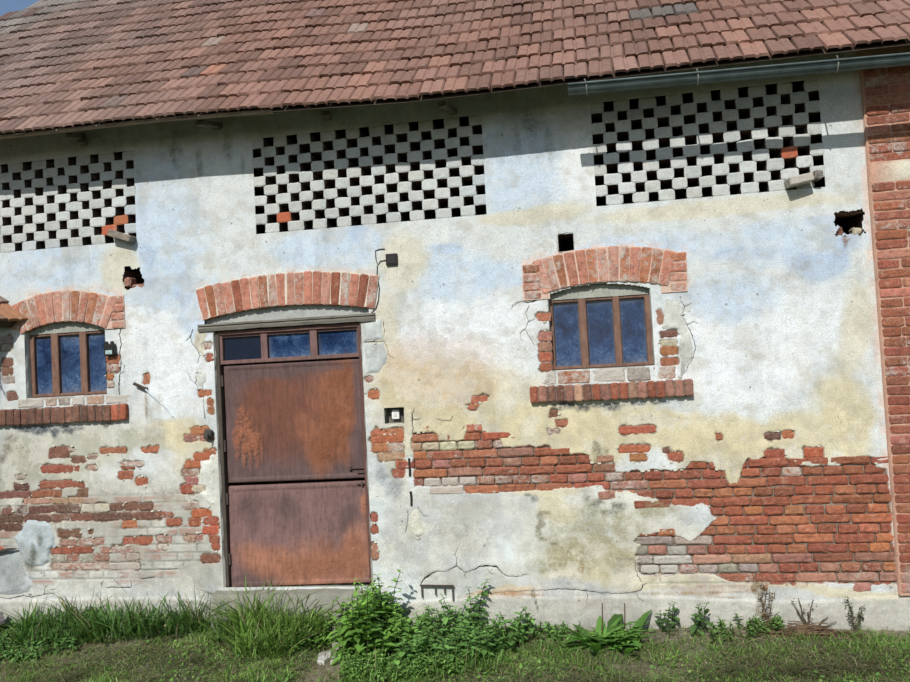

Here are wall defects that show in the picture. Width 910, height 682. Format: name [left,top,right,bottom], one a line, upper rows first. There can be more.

spalling [834,209,866,237]
spalling [122,266,145,290]
flaking render [0,335,19,401]
flaking render [198,389,214,414]
flaking render [364,375,380,399]
flaking render [465,396,488,410]
flaking render [536,312,553,373]
rust [234,407,259,464]
flaking render [0,425,222,571]
flaking render [370,406,897,592]
crack [421,546,647,601]